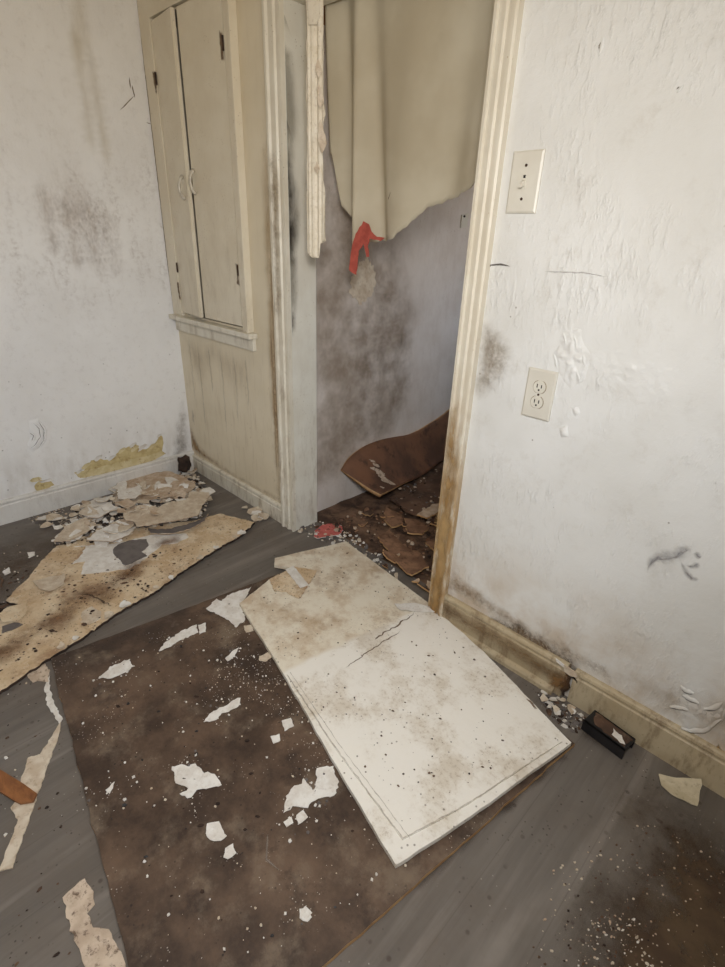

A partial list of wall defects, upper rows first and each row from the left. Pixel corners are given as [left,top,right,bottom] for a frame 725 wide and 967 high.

peeling [74,434,166,478]
peeling [30,477,54,491]
damp [495,616,576,678]